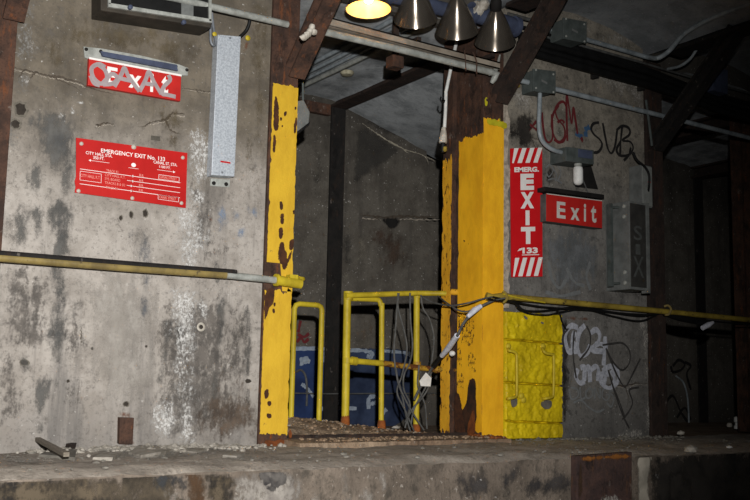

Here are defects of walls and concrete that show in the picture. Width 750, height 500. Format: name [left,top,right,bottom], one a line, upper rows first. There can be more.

crack [14,67,111,94]
crack [141,112,185,134]
peeling [273,96,297,152]
damp [15,200,72,255]
peeling [278,201,294,270]
damp [7,266,87,361]
damp [1,357,17,415]
damp [36,380,51,411]
damp [93,271,257,443]
peeling [454,310,476,435]